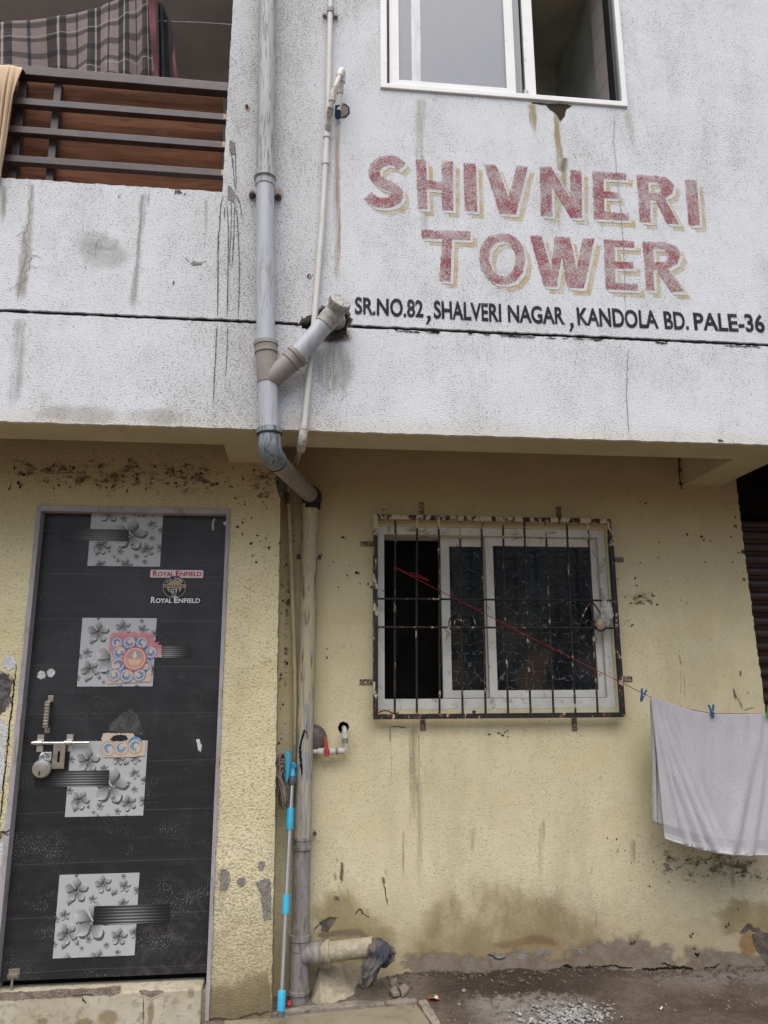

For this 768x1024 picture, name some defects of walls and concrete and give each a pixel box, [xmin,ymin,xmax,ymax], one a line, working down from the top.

leakage [213,141,242,399]
leakage [8,459,287,567]
peeling [0,655,17,790]
flaking render [219,861,272,922]
leakage [653,851,768,890]
leakage [724,902,768,956]